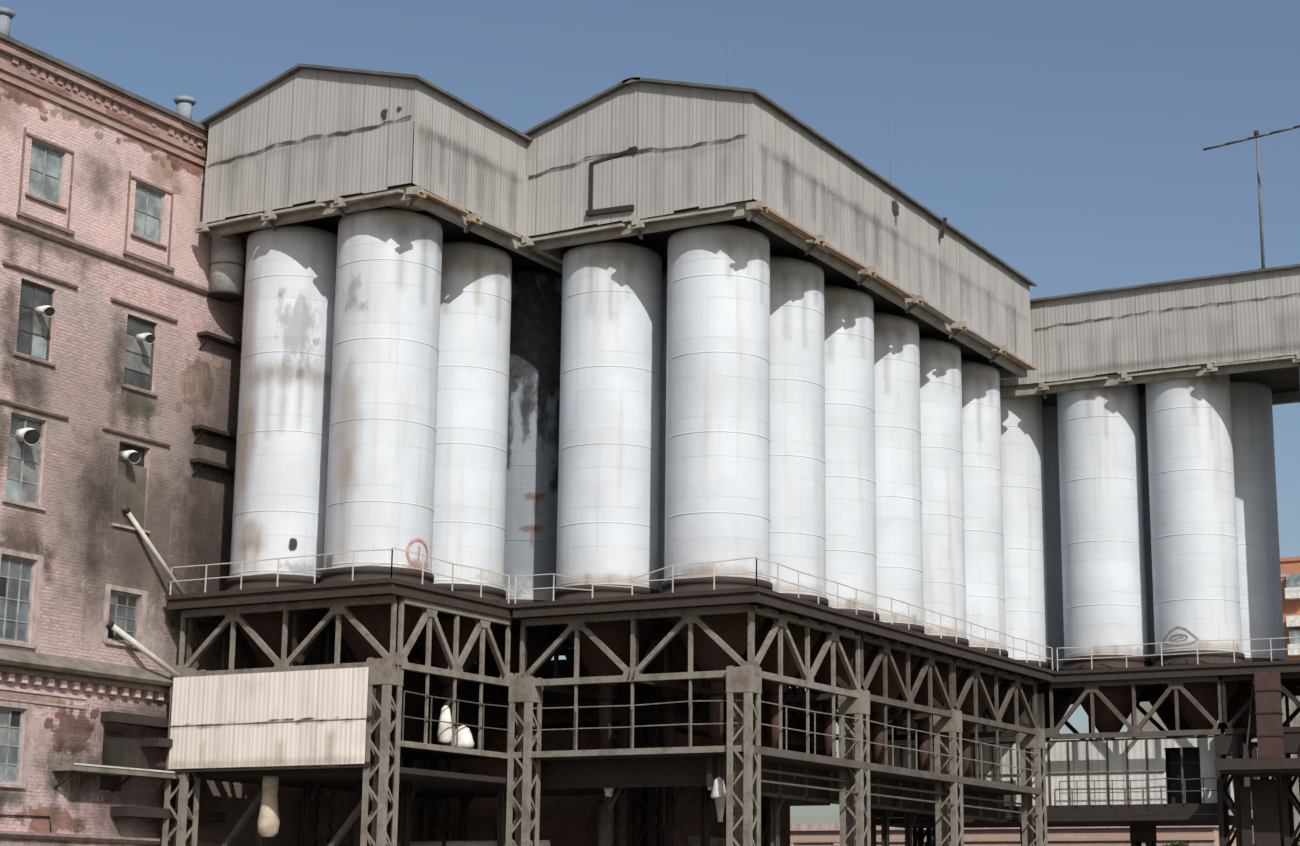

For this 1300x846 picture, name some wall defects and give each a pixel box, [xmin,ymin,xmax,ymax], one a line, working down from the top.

flaking render [0,690,100,754]
spalling [15,806,86,834]